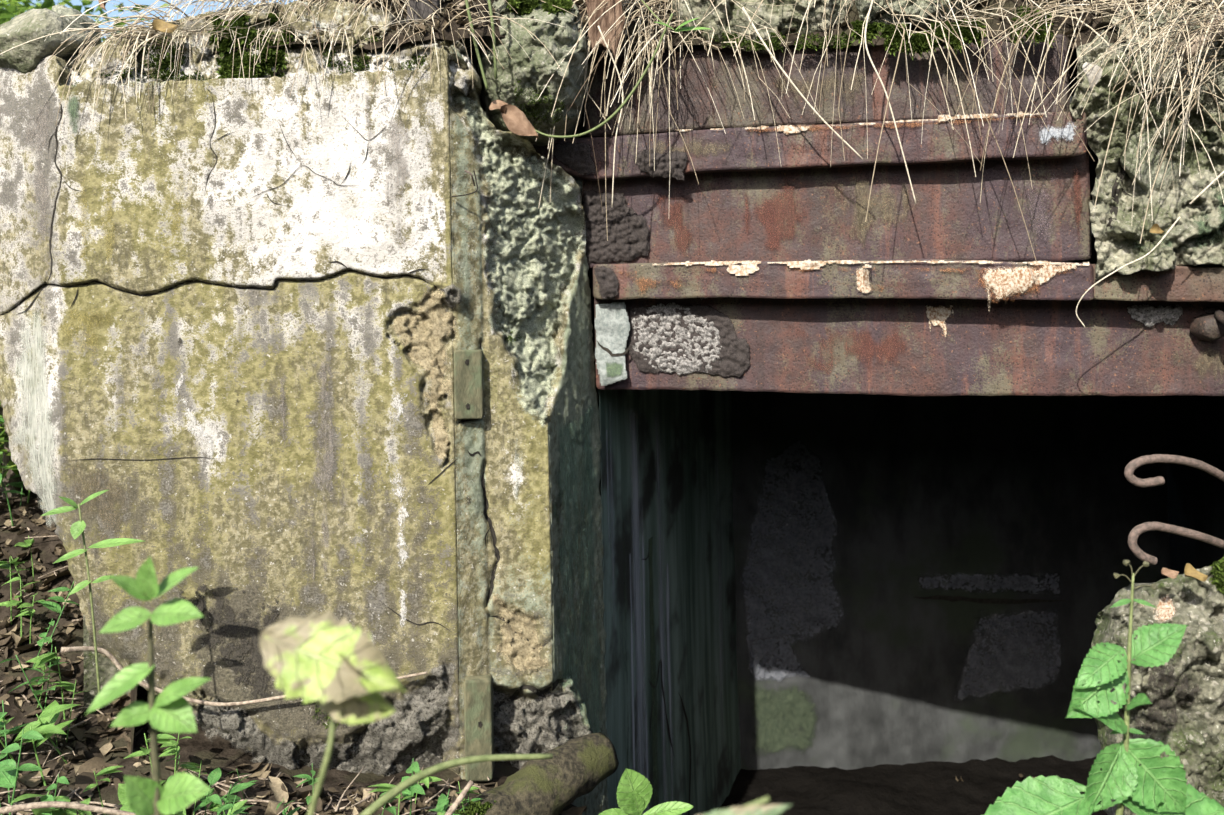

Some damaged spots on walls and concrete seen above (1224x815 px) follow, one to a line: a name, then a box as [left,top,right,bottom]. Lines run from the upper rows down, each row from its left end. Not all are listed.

crack [1,88,444,315]
spalling [453,89,586,426]
corrosion [634,149,688,180]
corrosion [583,184,1089,300]
corrosion [745,111,1045,134]
leakage [16,316,55,524]
spalling [393,289,455,459]
leakage [390,474,409,564]
crack [428,412,550,652]
spalling [1128,521,1224,565]
leakage [179,579,280,701]
spalling [193,656,459,776]